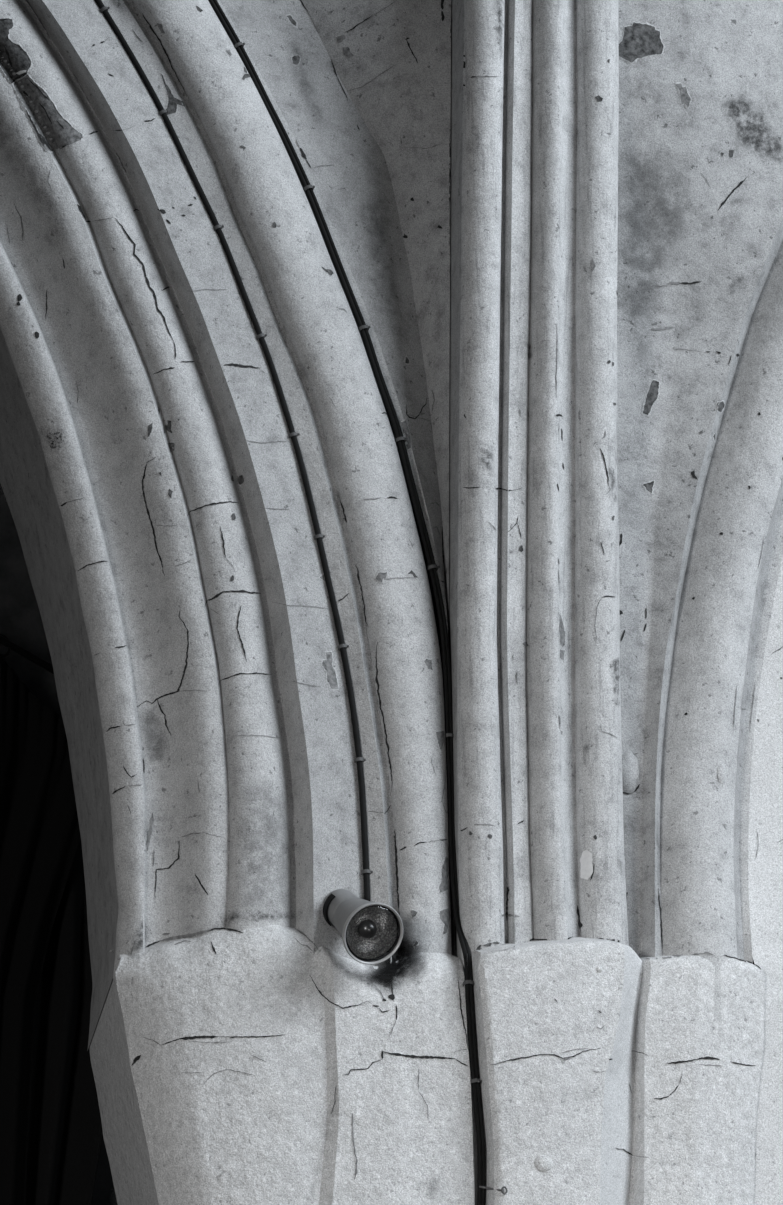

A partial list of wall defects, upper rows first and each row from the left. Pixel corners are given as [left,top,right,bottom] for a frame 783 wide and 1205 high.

spalling [0,17,83,154]
spalling [619,21,666,64]
crack [115,218,176,358]
crack [142,459,191,576]
crack [137,612,203,734]
crack [211,606,247,662]
crack [123,759,221,895]
crack [295,929,397,1036]